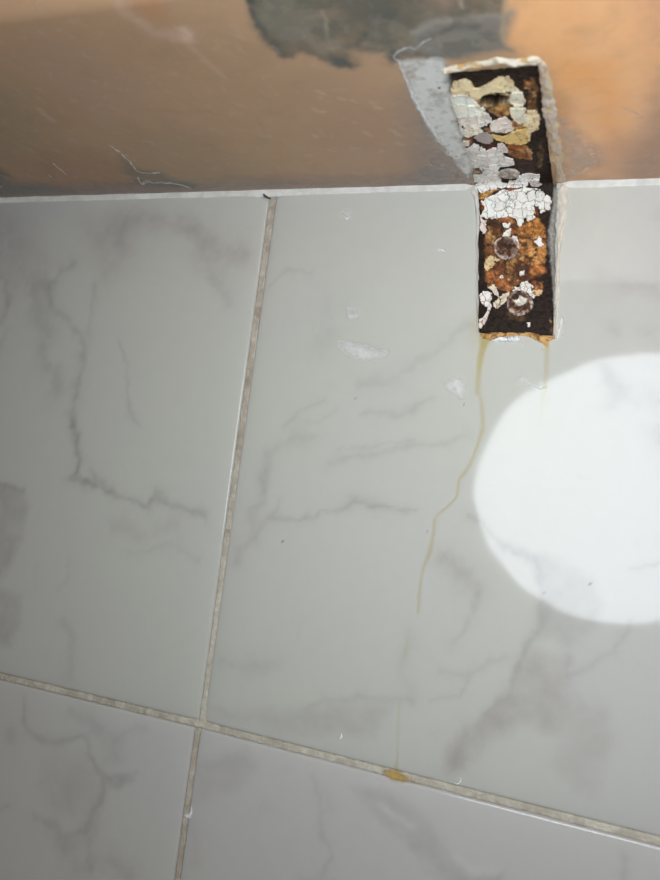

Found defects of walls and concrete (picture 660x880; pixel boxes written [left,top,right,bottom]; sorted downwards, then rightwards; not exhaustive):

peeling [450,76,552,248]
peeling [479,255,543,329]
corrosion [480,332,555,347]
corrosion [384,771,408,781]